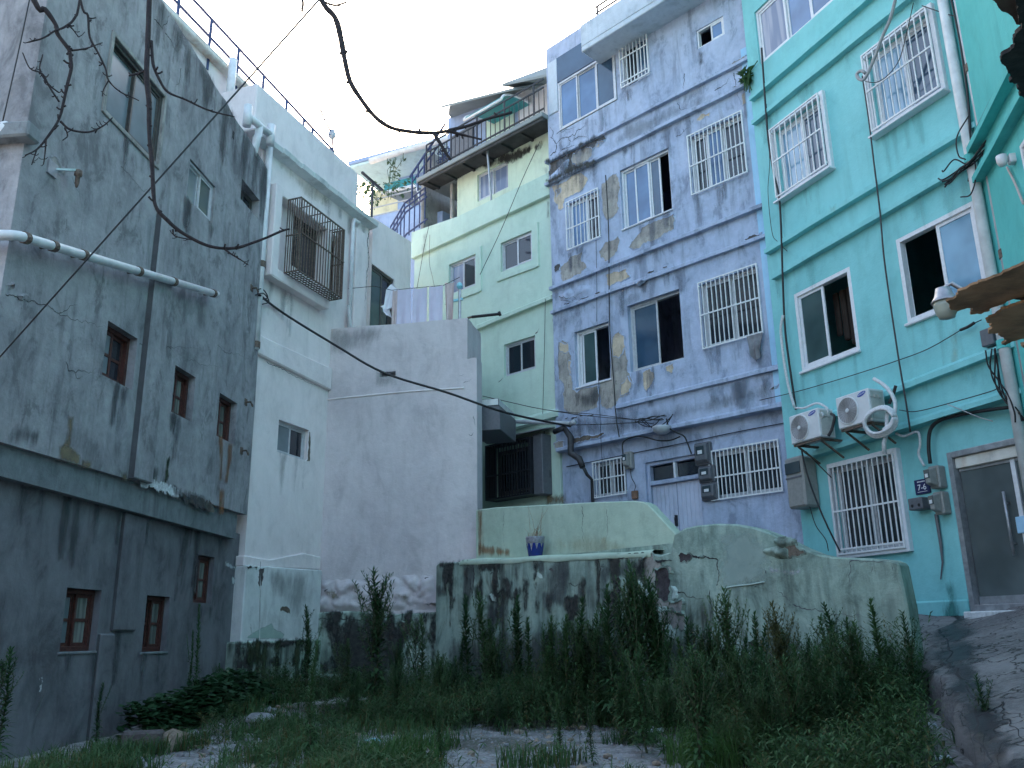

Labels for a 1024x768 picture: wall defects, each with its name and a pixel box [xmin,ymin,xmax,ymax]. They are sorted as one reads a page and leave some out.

damp [203,72,214,105]
damp [221,106,235,158]
damp [242,135,267,208]
crack [550,125,585,156]
peeling [548,135,607,211]
peeling [554,213,676,299]
damp [111,383,124,422]
peeling [557,330,675,419]
spalling [140,479,214,512]
damp [438,557,699,684]
crack [569,512,719,612]
spalling [638,551,705,642]